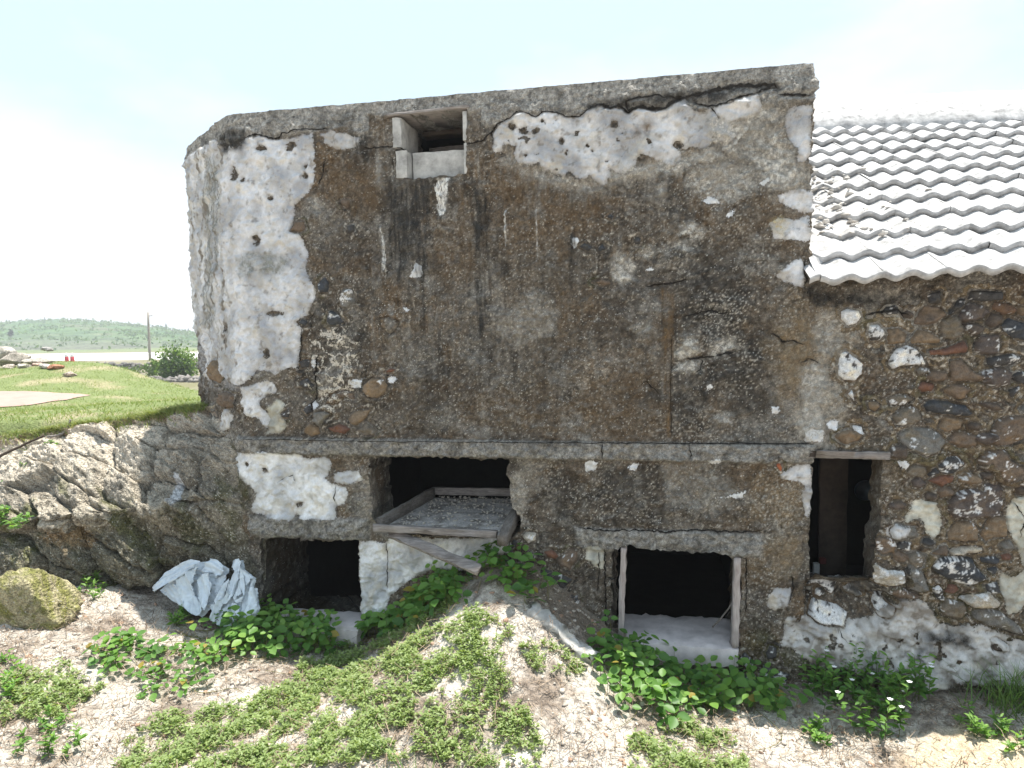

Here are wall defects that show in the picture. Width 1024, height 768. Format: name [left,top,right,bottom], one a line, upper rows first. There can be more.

peeling [491,94,762,185]
crack [467,82,810,144]
peeling [784,105,813,163]
leakage [380,178,450,280]
leakage [474,188,490,251]
peeling [704,196,735,218]
peeling [768,188,815,243]
peeling [409,263,423,278]
peeling [774,258,805,288]
peeling [181,129,401,522]
peeling [358,527,605,614]